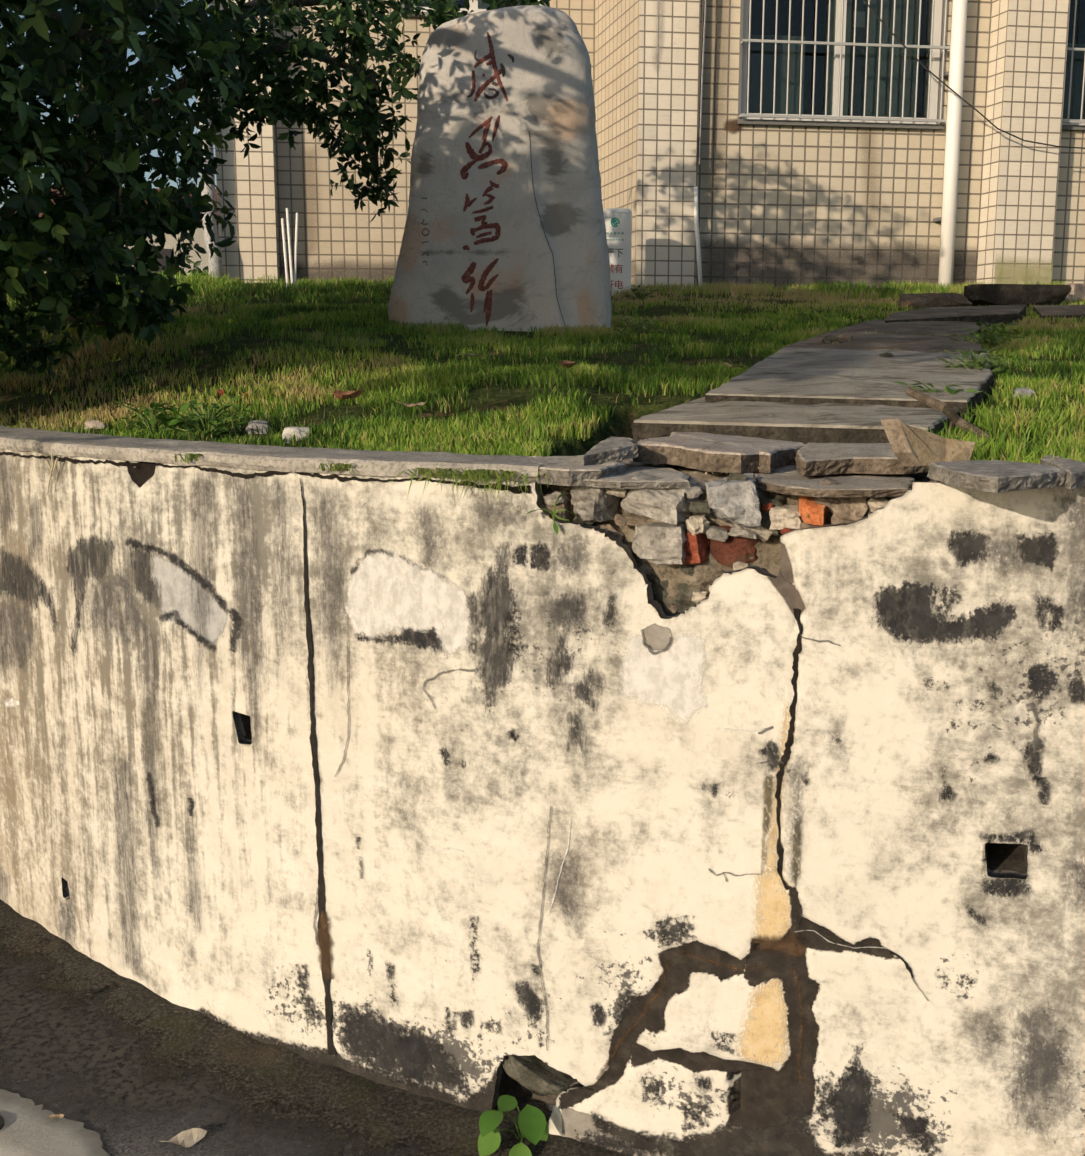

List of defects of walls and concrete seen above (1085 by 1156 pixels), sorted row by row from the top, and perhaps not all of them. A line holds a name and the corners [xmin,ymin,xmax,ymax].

peeling [125,538,241,653]
peeling [345,549,470,654]
flaking render [768,543,805,614]
water stain [871,580,1017,644]
water stain [948,531,1059,572]
water stain [66,535,162,867]
crack [0,452,530,1055]
water stain [1020,664,1085,805]
crack [558,608,928,1130]
water stain [515,964,543,1047]
spalling [497,1066,663,1156]
water stain [614,1044,886,1156]